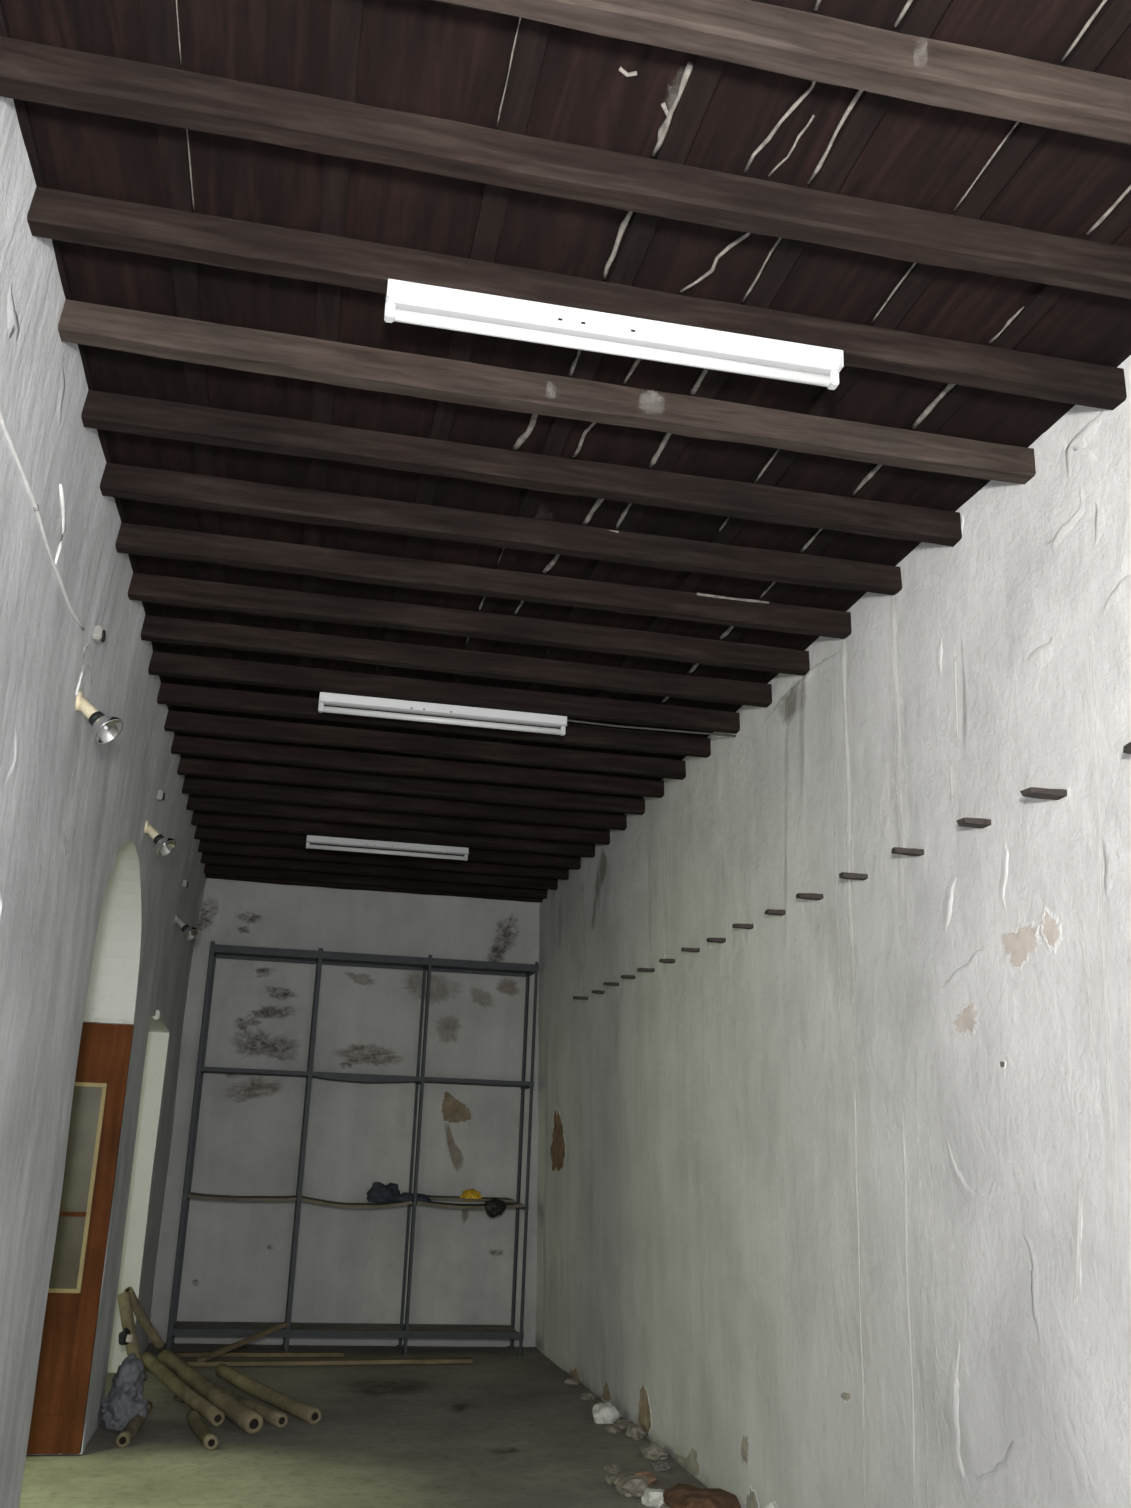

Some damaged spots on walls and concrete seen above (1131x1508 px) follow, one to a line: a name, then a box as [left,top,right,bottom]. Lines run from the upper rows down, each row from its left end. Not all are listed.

flaking render [999,840,1063,971]
leakage [239,988,291,1059]
flaking render [952,998,980,1038]
flaking render [439,1090,473,1124]
flaking render [550,1106,566,1175]
flaking render [638,1382,652,1437]